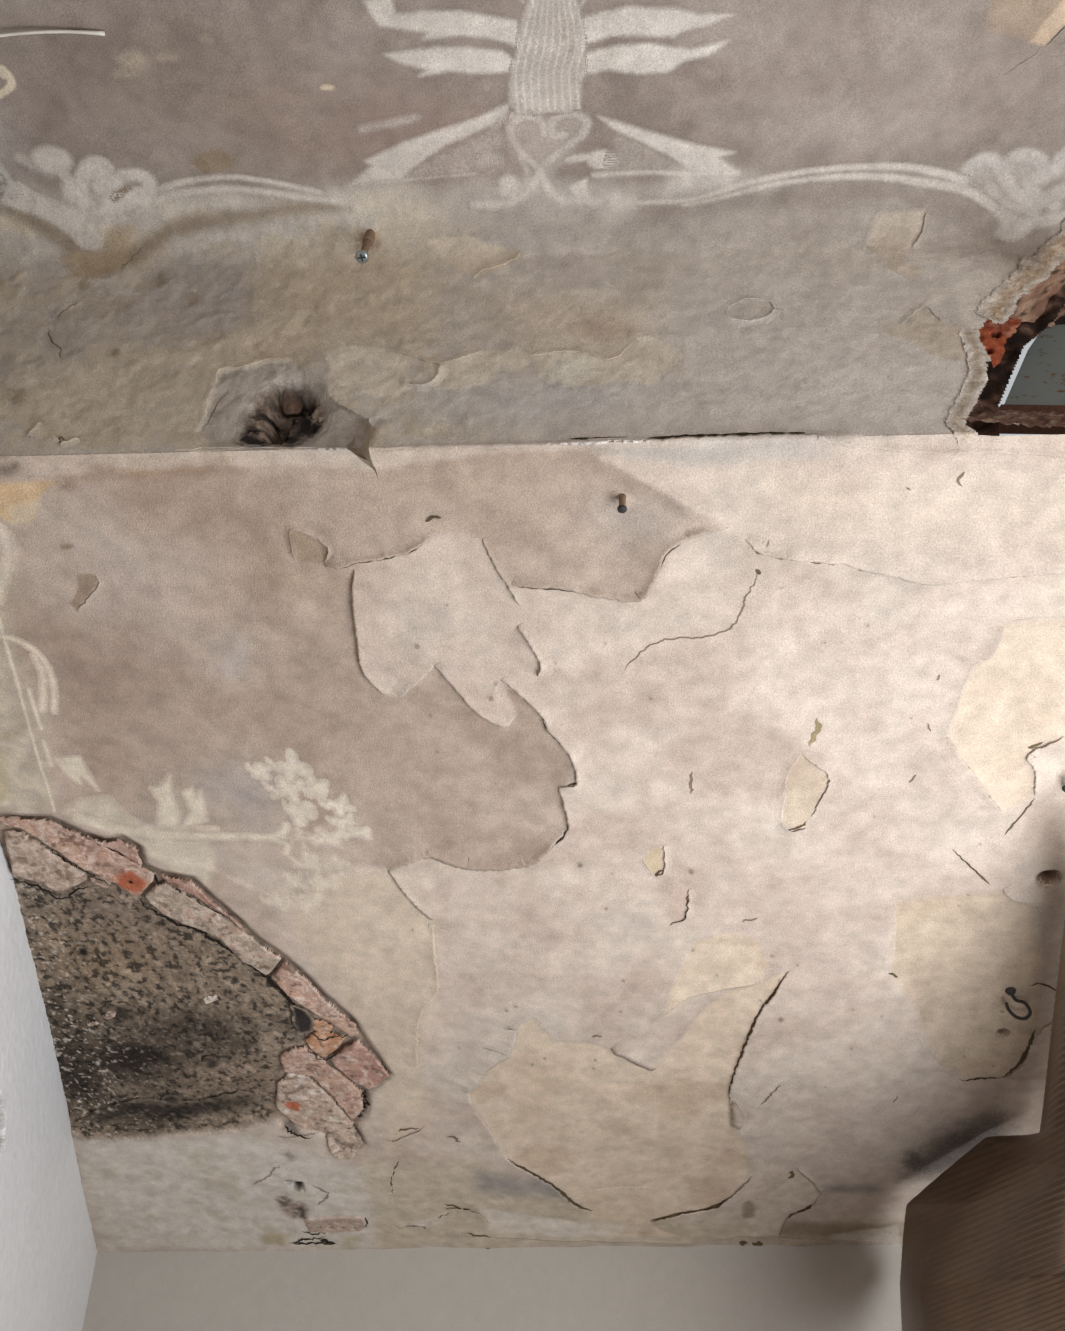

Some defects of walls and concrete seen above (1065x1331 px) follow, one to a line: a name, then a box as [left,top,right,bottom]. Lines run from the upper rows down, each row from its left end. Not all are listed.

peeling [983,0,1065,73]
peeling [862,206,931,281]
spalling [878,220,1065,446]
peeling [0,333,732,1250]
peeling [773,718,838,837]
peeling [939,617,1065,833]
peeling [881,850,1056,1088]
peeling [393,930,903,1249]